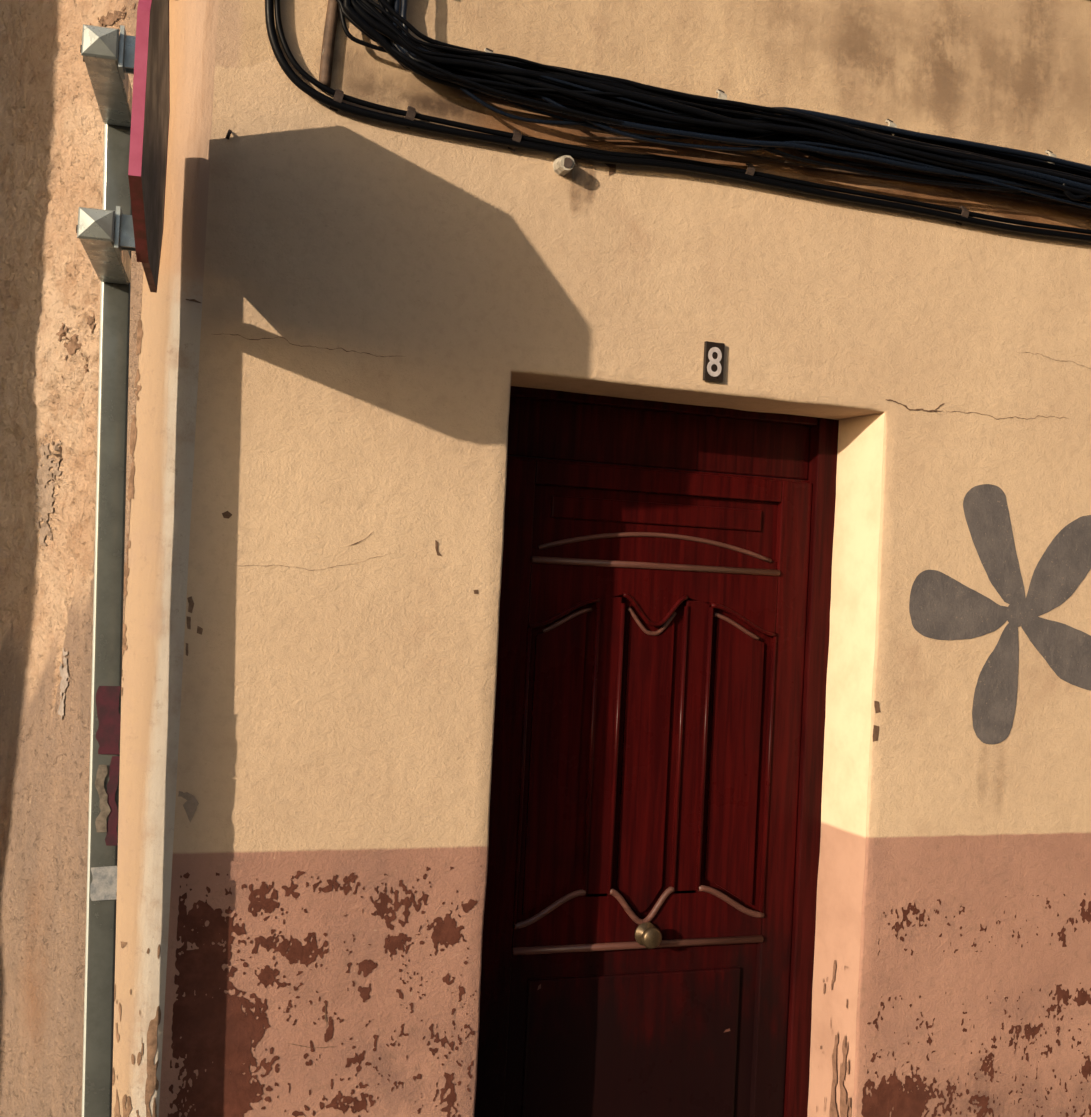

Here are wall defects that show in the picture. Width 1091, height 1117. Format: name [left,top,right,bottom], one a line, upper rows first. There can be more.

crack [215,334,391,357]
crack [886,399,1066,419]
peeling [883,893,1091,956]
peeling [112,867,477,1117]
peeling [816,983,1091,1117]